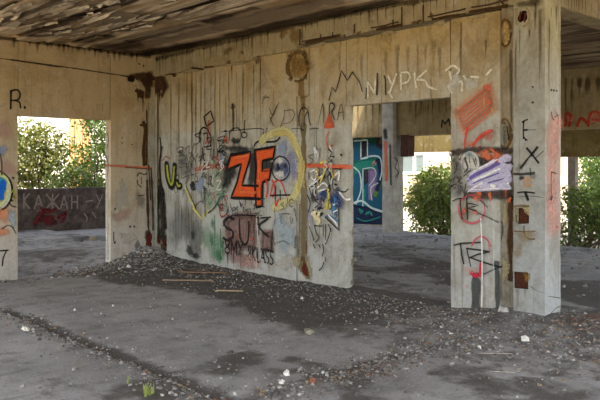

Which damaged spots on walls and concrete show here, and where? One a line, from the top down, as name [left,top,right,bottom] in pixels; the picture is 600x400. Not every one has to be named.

peeling [0,0,241,39]
water stain [0,0,437,67]
water stain [186,83,201,181]
corrosion [298,79,306,123]
corrosion [135,230,167,251]
corrosion [501,196,535,289]